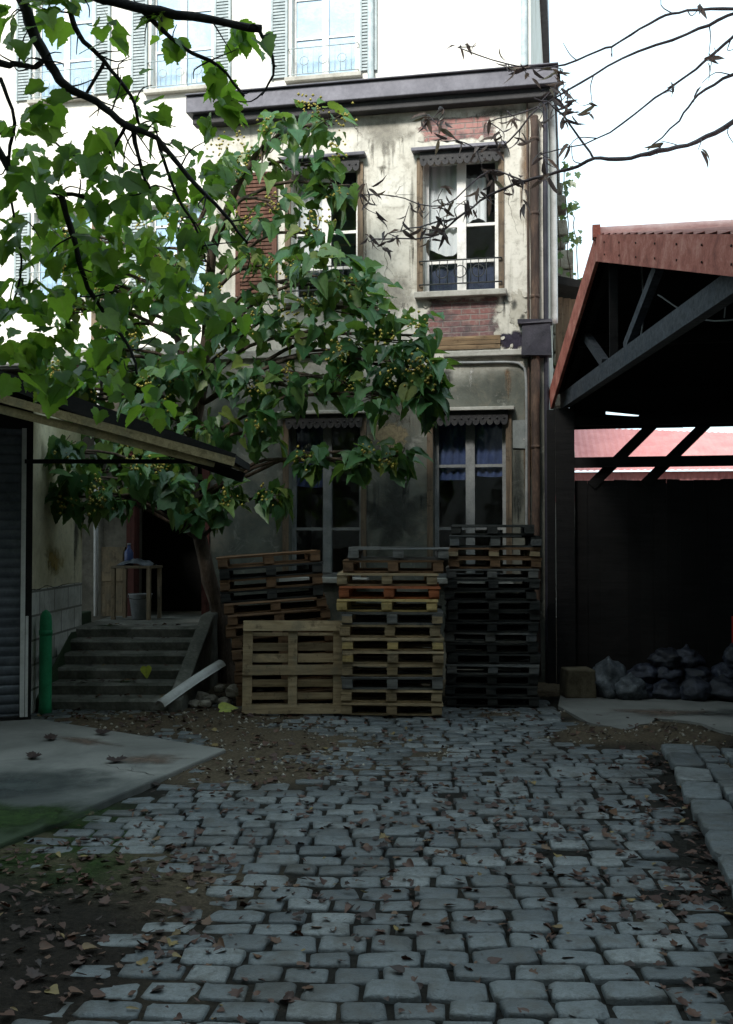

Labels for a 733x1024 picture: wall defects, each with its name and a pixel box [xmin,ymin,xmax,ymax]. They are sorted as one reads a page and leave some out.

damp [366,122,401,153]
spalling [416,111,495,142]
spalling [423,289,527,348]